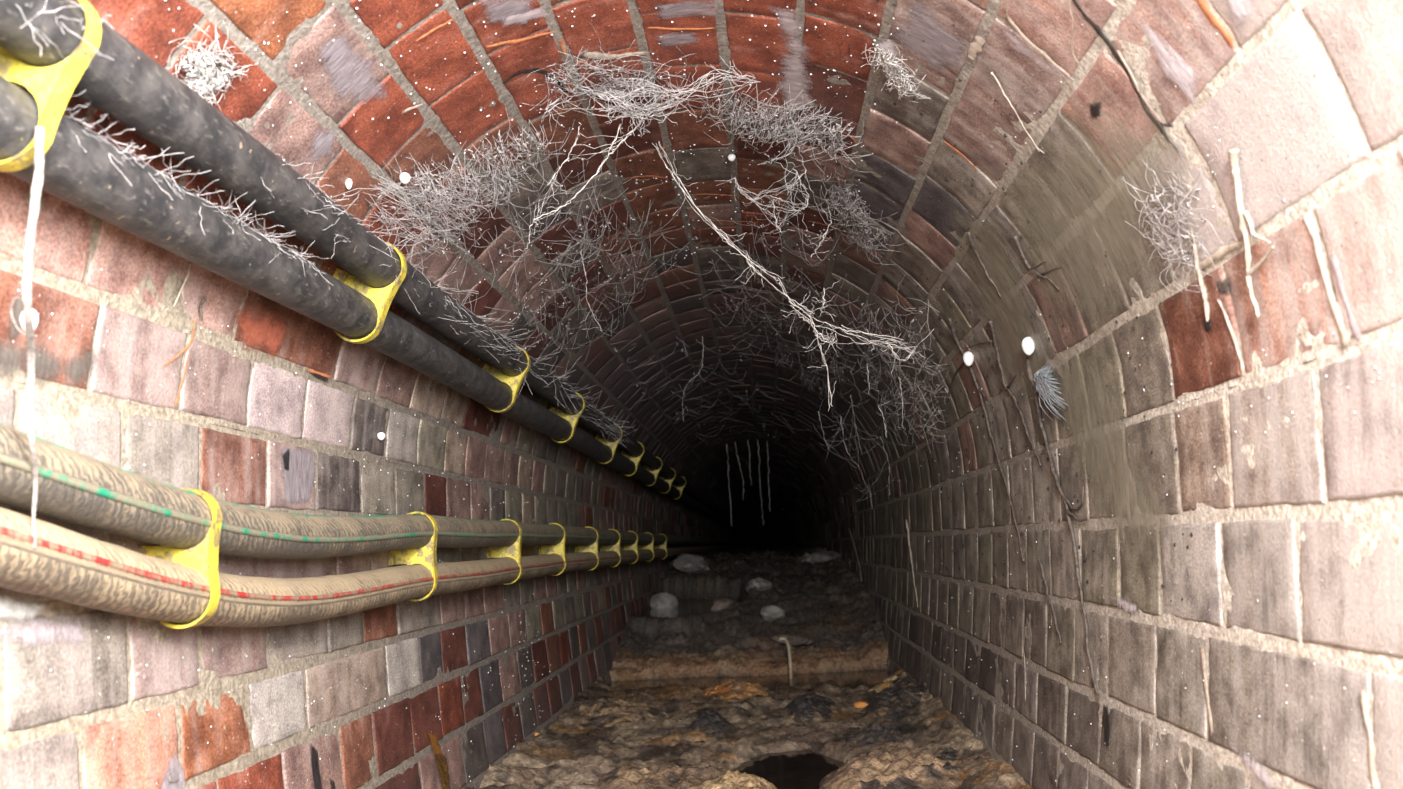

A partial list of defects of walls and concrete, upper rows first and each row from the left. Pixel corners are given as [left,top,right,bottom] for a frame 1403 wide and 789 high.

leakage [1360,691,1380,789]